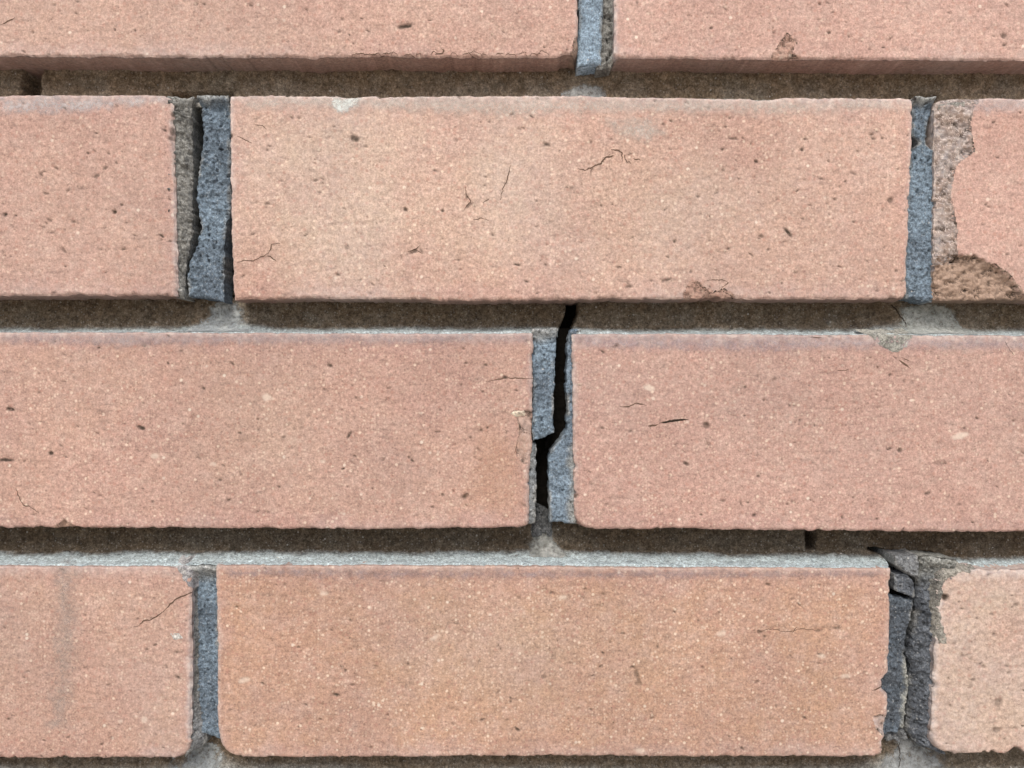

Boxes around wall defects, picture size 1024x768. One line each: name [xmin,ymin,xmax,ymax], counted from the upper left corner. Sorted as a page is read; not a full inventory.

spalling [932,99,1024,301]
crack [488,305,576,509]
crack [891,567,909,597]